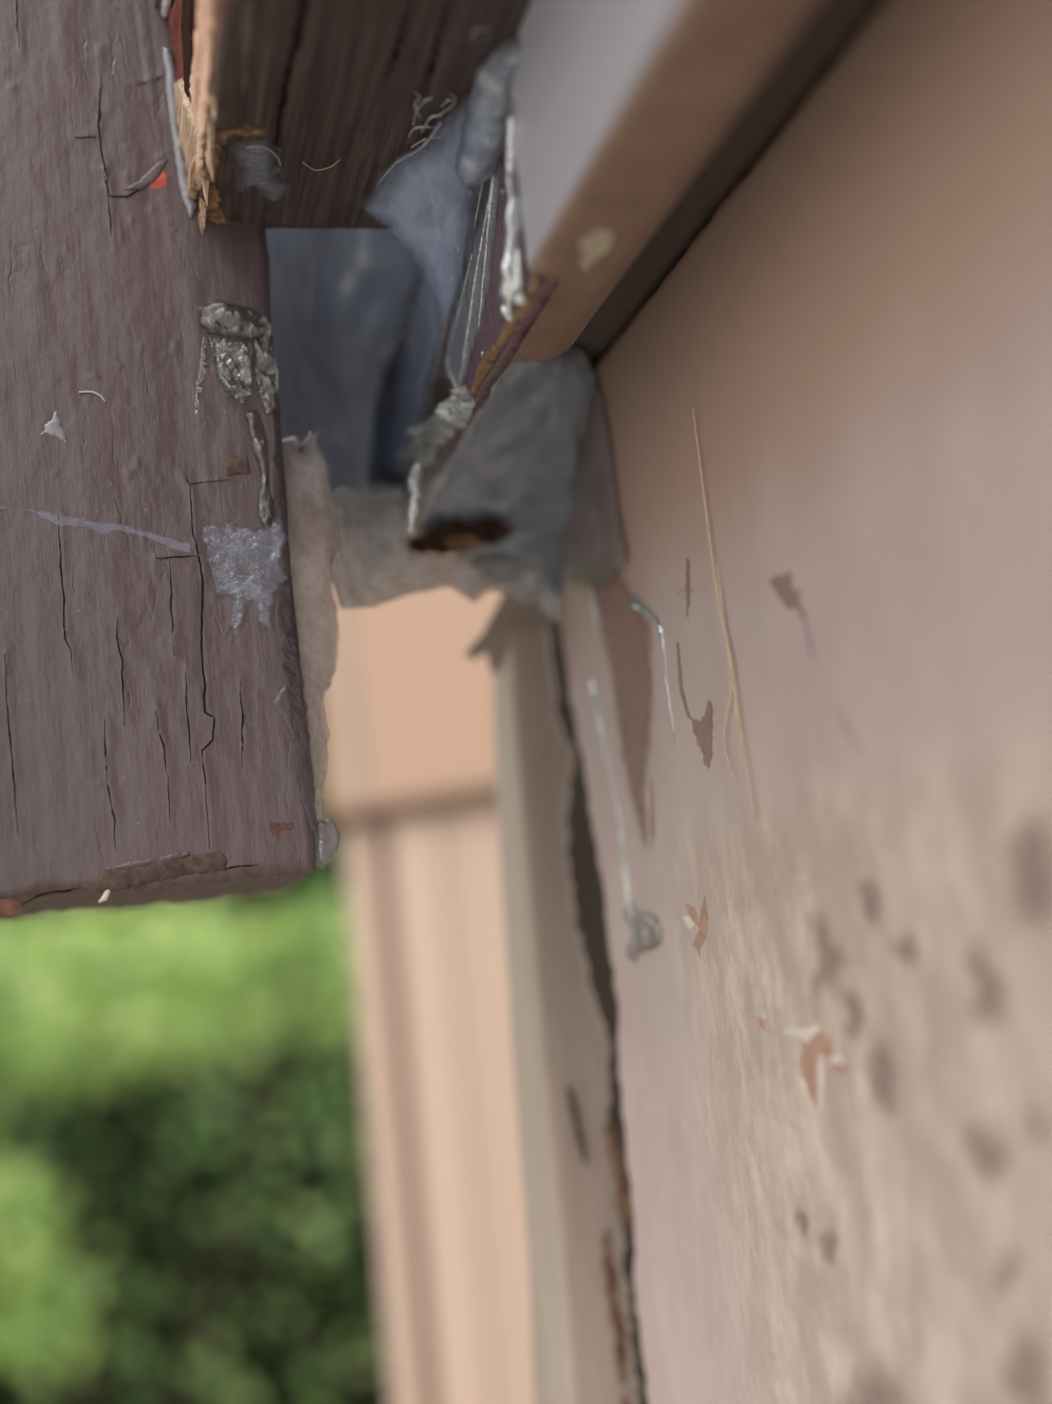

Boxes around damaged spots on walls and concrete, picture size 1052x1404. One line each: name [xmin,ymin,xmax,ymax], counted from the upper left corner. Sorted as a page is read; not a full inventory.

crack [75,54,157,237]
peeling [124,0,197,219]
crack [275,0,309,164]
crack [4,654,18,831]
crack [58,517,73,676]
crack [104,477,258,870]
corrosion [444,534,482,554]
peeling [691,701,713,768]
peeling [770,572,806,622]
crack [21,887,82,906]
peeling [758,1018,847,1117]
corrosion [603,1230,629,1404]